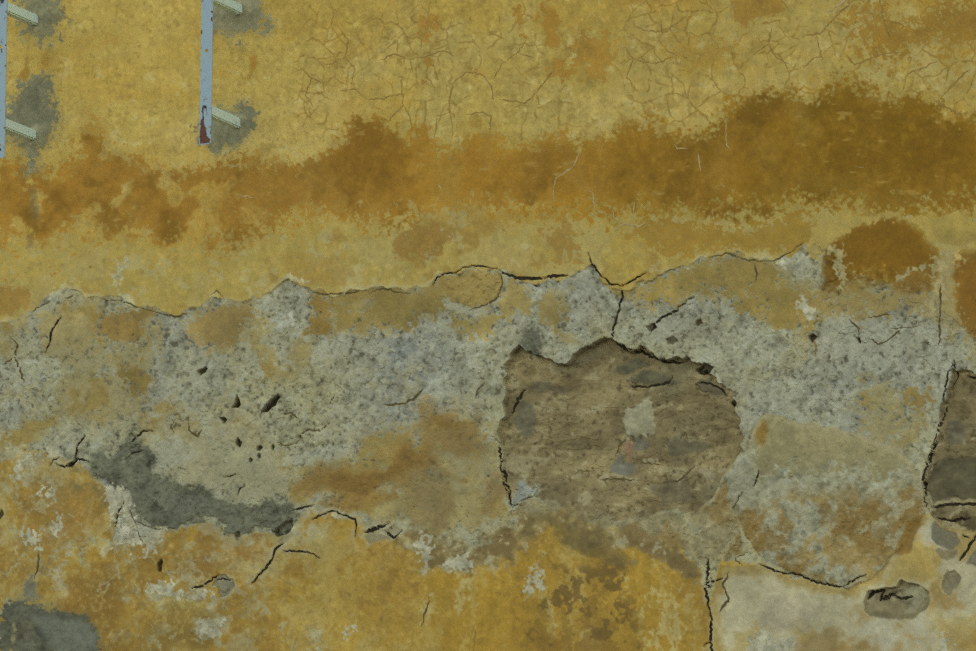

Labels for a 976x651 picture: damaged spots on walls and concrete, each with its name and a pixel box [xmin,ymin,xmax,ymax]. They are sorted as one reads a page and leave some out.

rust [199,105,211,144]
water stain [0,82,976,339]
crack [712,242,804,282]
crack [105,299,187,318]
crack [312,287,411,295]
flaking render [0,243,976,598]
crack [513,390,525,412]
crack [850,284,976,560]
crack [498,445,535,508]
crack [192,544,320,589]
crack [704,555,912,651]
spalling [865,580,930,620]